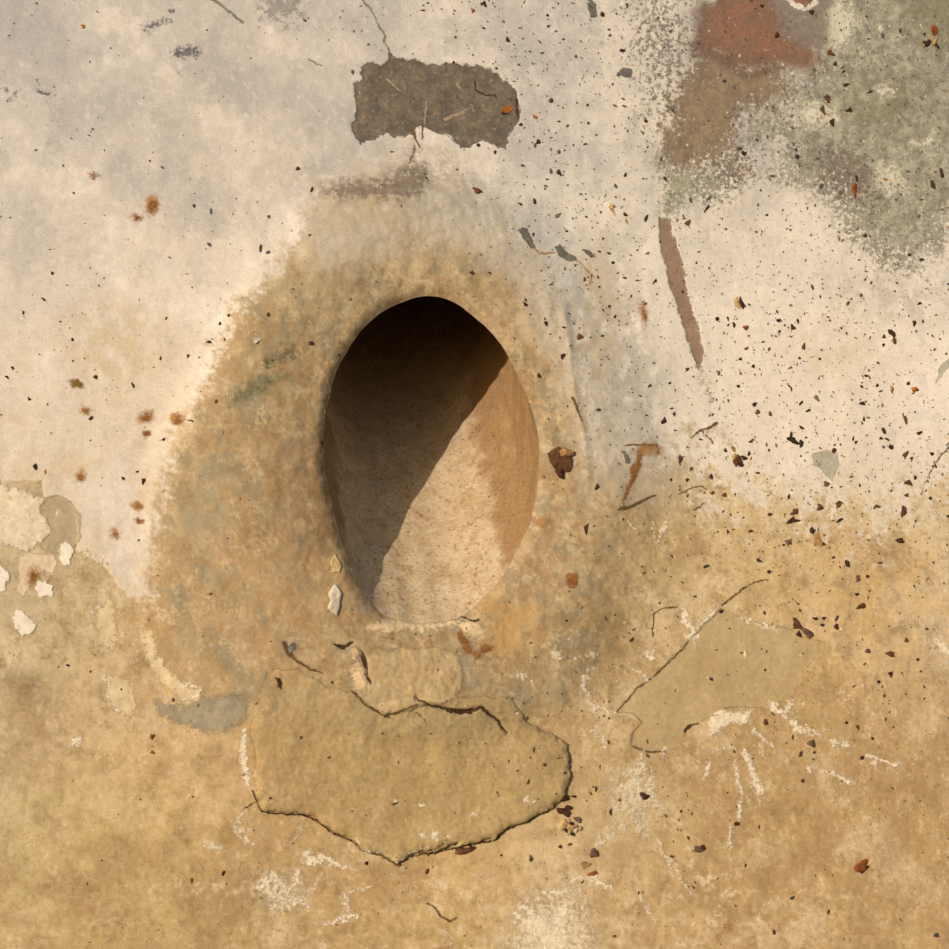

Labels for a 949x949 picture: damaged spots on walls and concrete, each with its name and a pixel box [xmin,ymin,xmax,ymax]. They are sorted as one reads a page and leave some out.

spalling [351,52,537,150]
peeling [0,483,103,636]
crack [282,642,322,673]
crack [334,642,507,734]
crack [651,607,678,636]
crack [721,579,768,606]
damp [768,698,850,748]
damp [700,708,775,851]
crack [243,788,568,866]
damp [496,871,615,949]